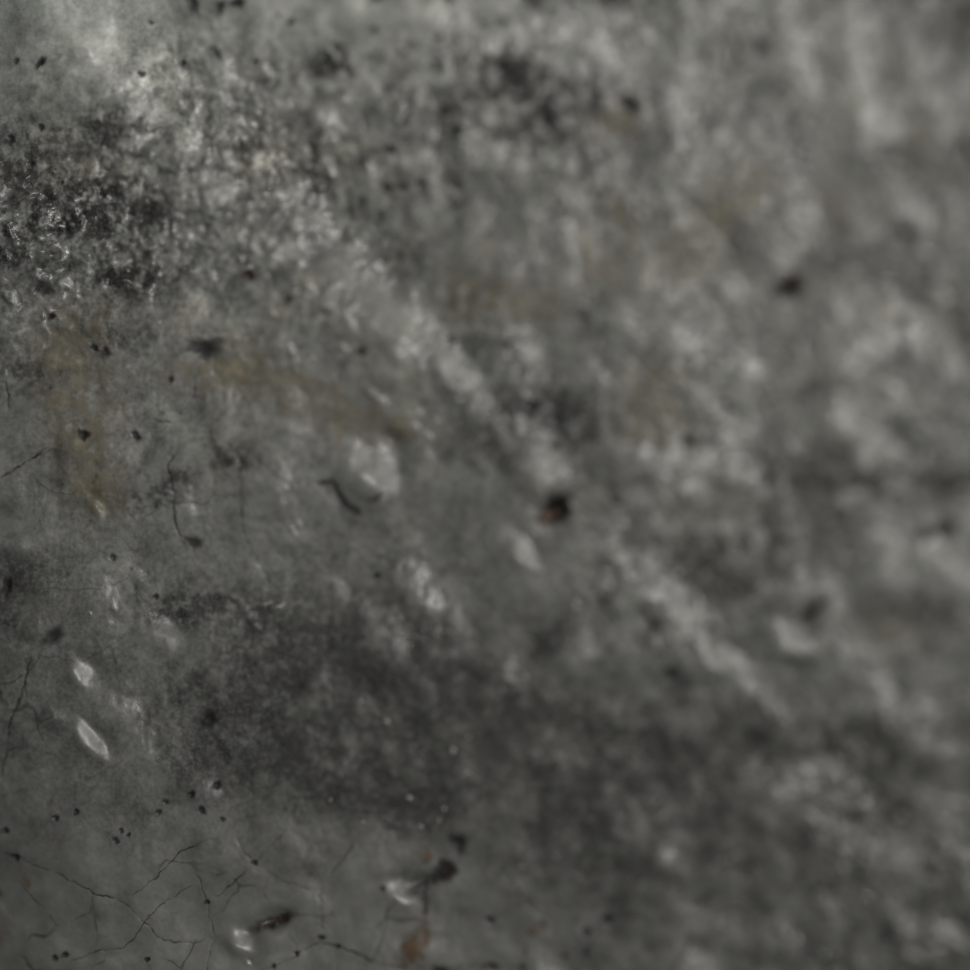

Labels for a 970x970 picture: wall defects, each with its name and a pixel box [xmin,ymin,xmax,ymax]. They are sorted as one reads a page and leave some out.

crack [167,457,181,536]